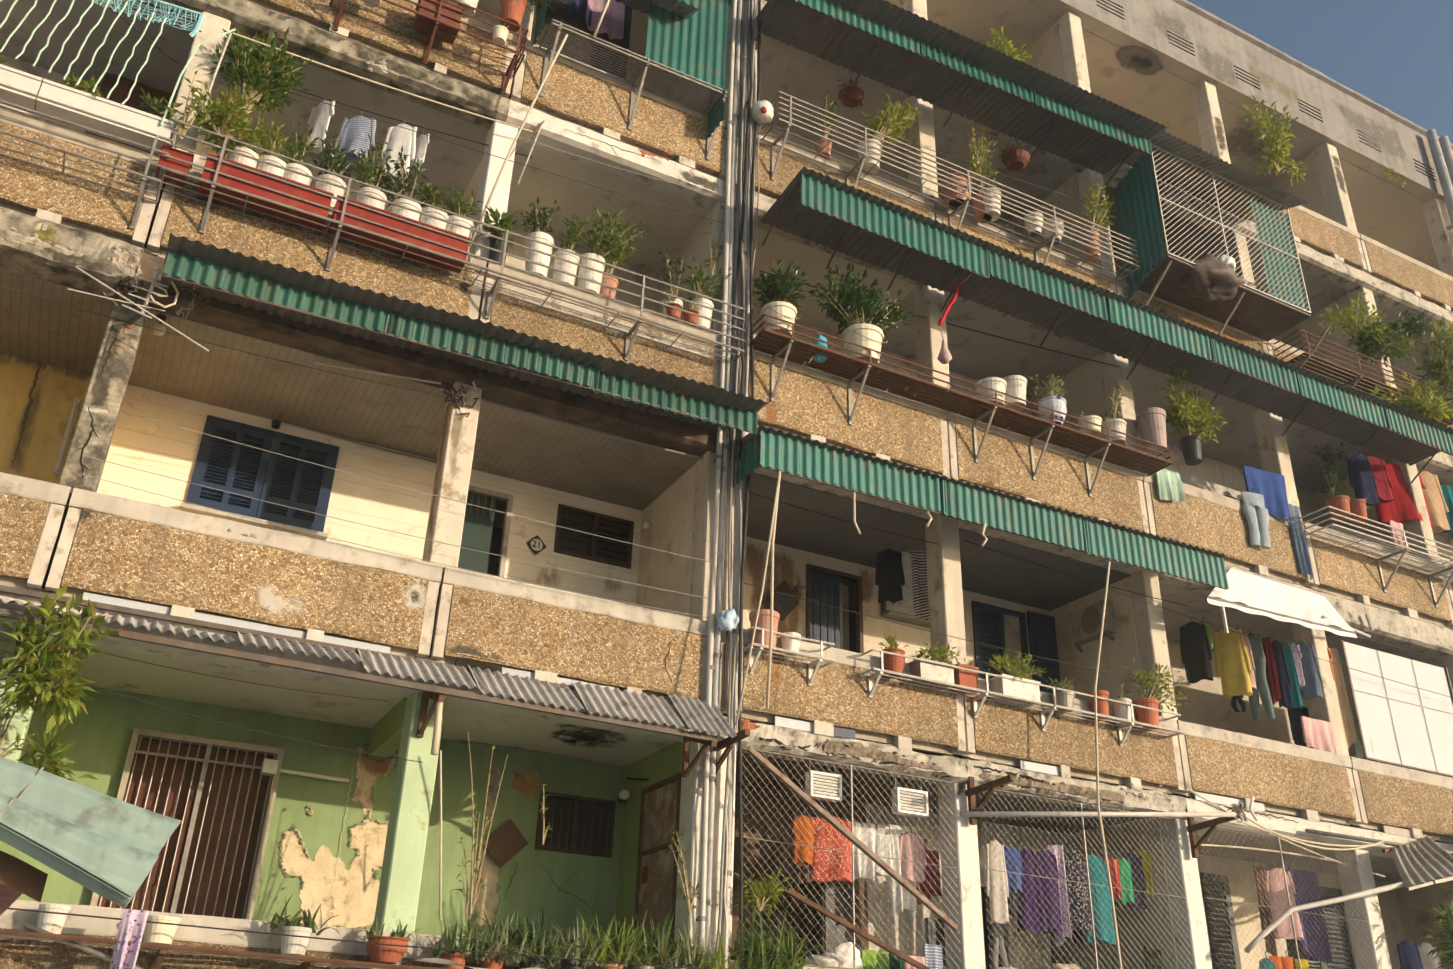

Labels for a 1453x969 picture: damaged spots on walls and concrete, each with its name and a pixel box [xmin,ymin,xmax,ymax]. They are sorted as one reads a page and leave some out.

damp [1116,47,1163,75]
peeling [279,745,399,929]